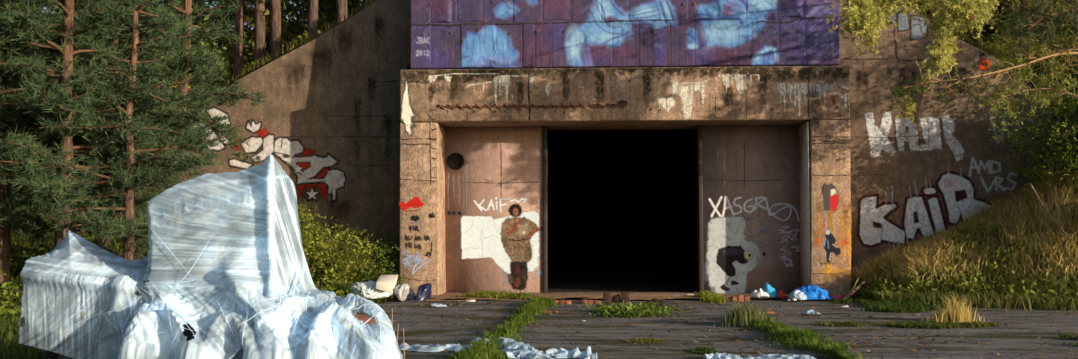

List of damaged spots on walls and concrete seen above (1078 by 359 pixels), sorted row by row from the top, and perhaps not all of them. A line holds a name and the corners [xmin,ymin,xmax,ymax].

damp [642,71,850,125]